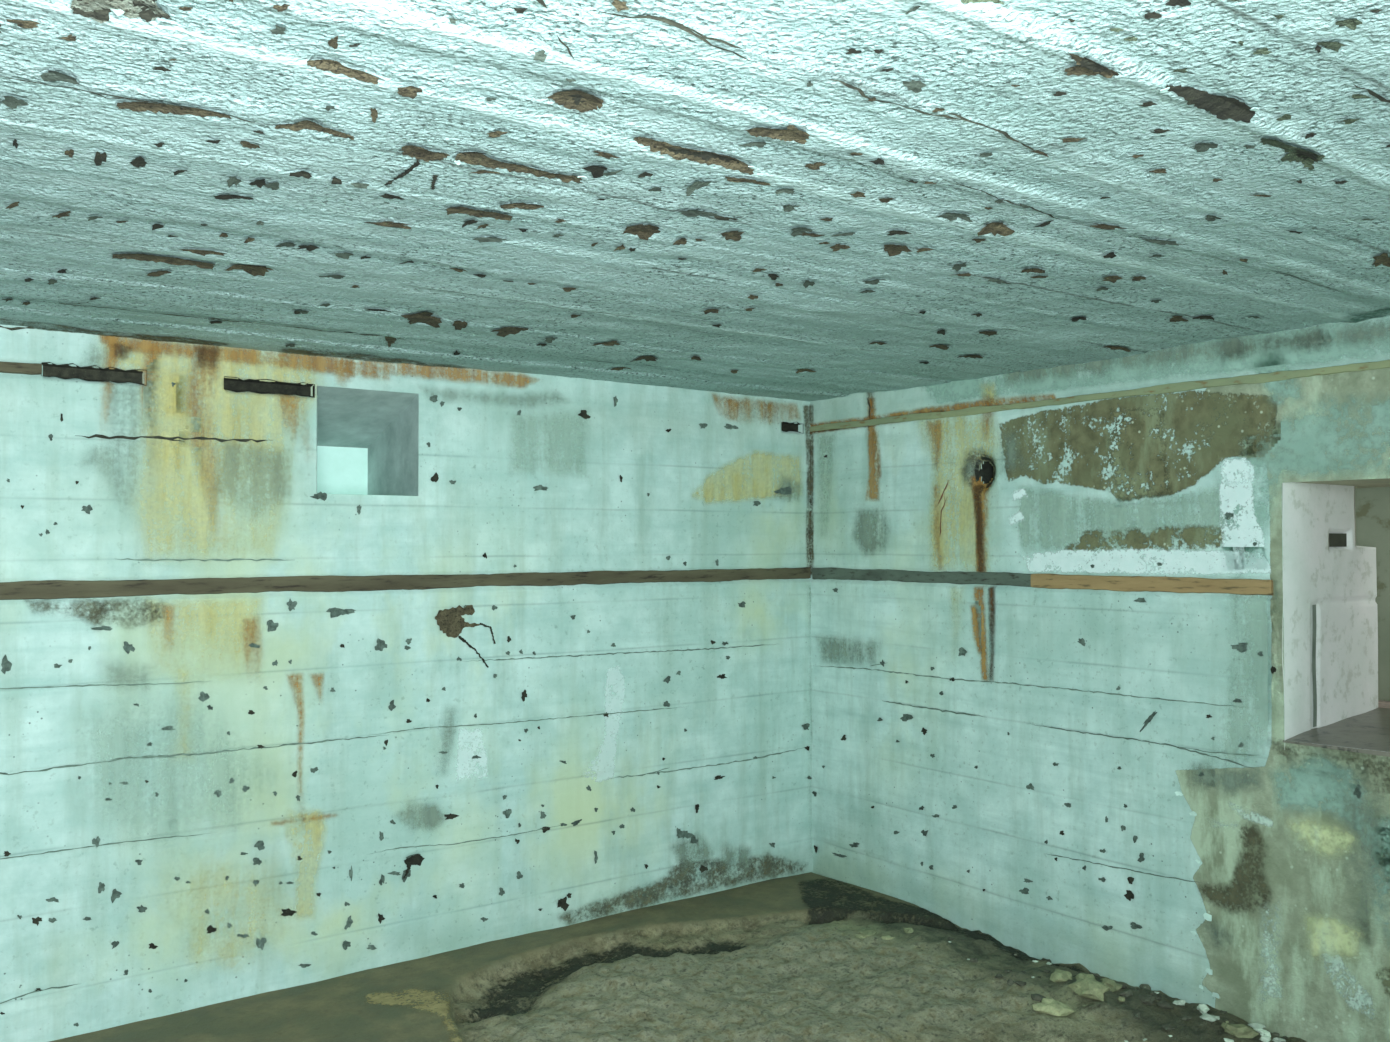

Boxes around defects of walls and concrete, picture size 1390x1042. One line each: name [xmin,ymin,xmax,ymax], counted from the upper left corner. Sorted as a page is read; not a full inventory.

spalling [70,0,193,23]
leakage [927,308,1390,404]
rust [102,335,531,548]
leakage [696,406,831,575]
rust [788,395,1055,680]
leakage [1019,400,1390,559]
rust [289,675,322,750]
peeling [1000,368,1390,1042]
leakage [561,842,802,924]